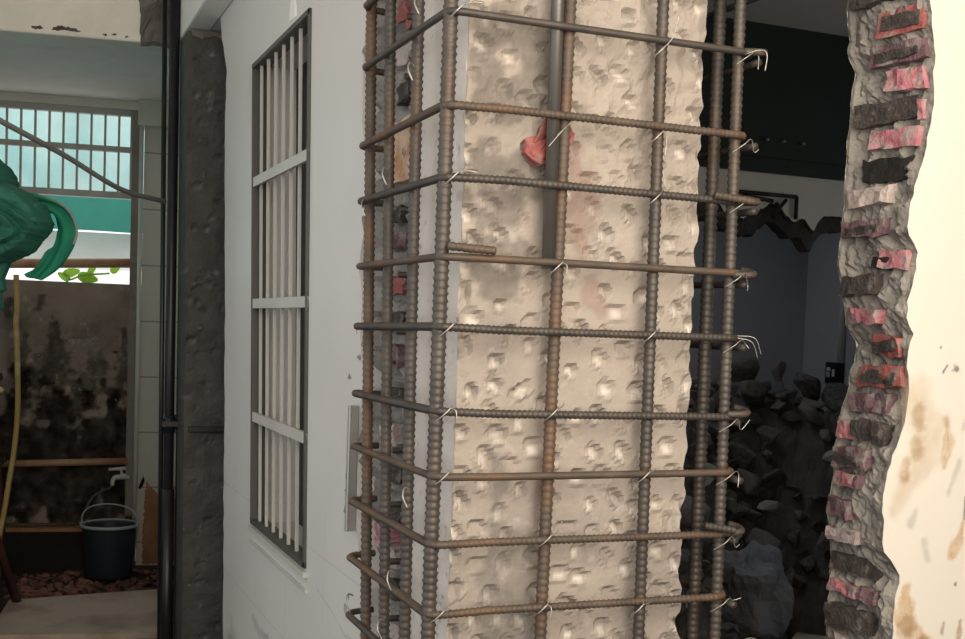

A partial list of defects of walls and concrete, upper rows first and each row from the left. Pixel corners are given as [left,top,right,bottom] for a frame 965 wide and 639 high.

flaking render [139,0,170,48]
spalling [697,0,935,639]
damp [0,367,127,523]